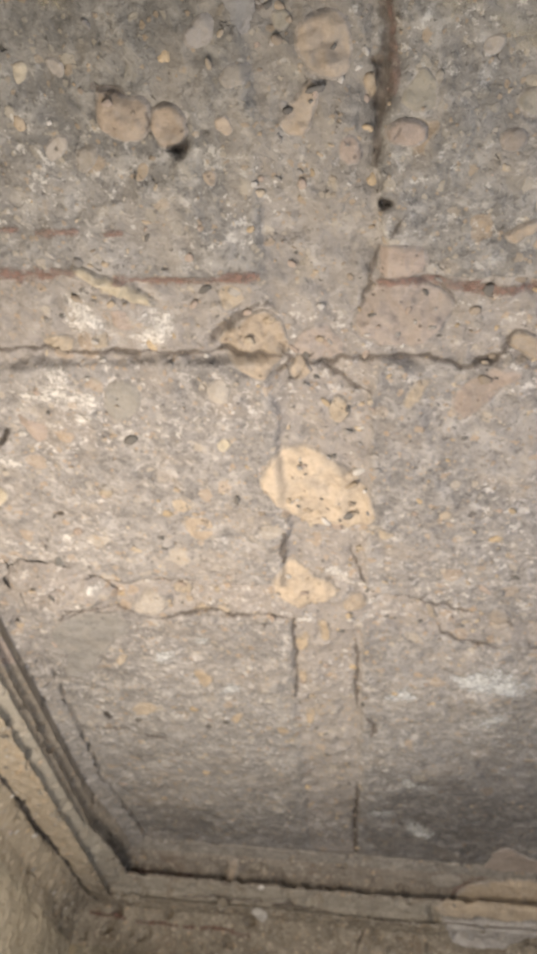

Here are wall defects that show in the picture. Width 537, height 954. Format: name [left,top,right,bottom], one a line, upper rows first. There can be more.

crack [371,0,393,156]
rust [0,269,74,282]
rust [112,273,258,288]
crack [361,224,399,303]
rust [377,275,537,295]
crack [0,322,509,391]
crack [279,534,287,562]
crack [354,557,374,592]
crack [59,576,298,697]
crack [439,629,495,648]
crack [354,645,377,736]
crack [0,775,98,900]